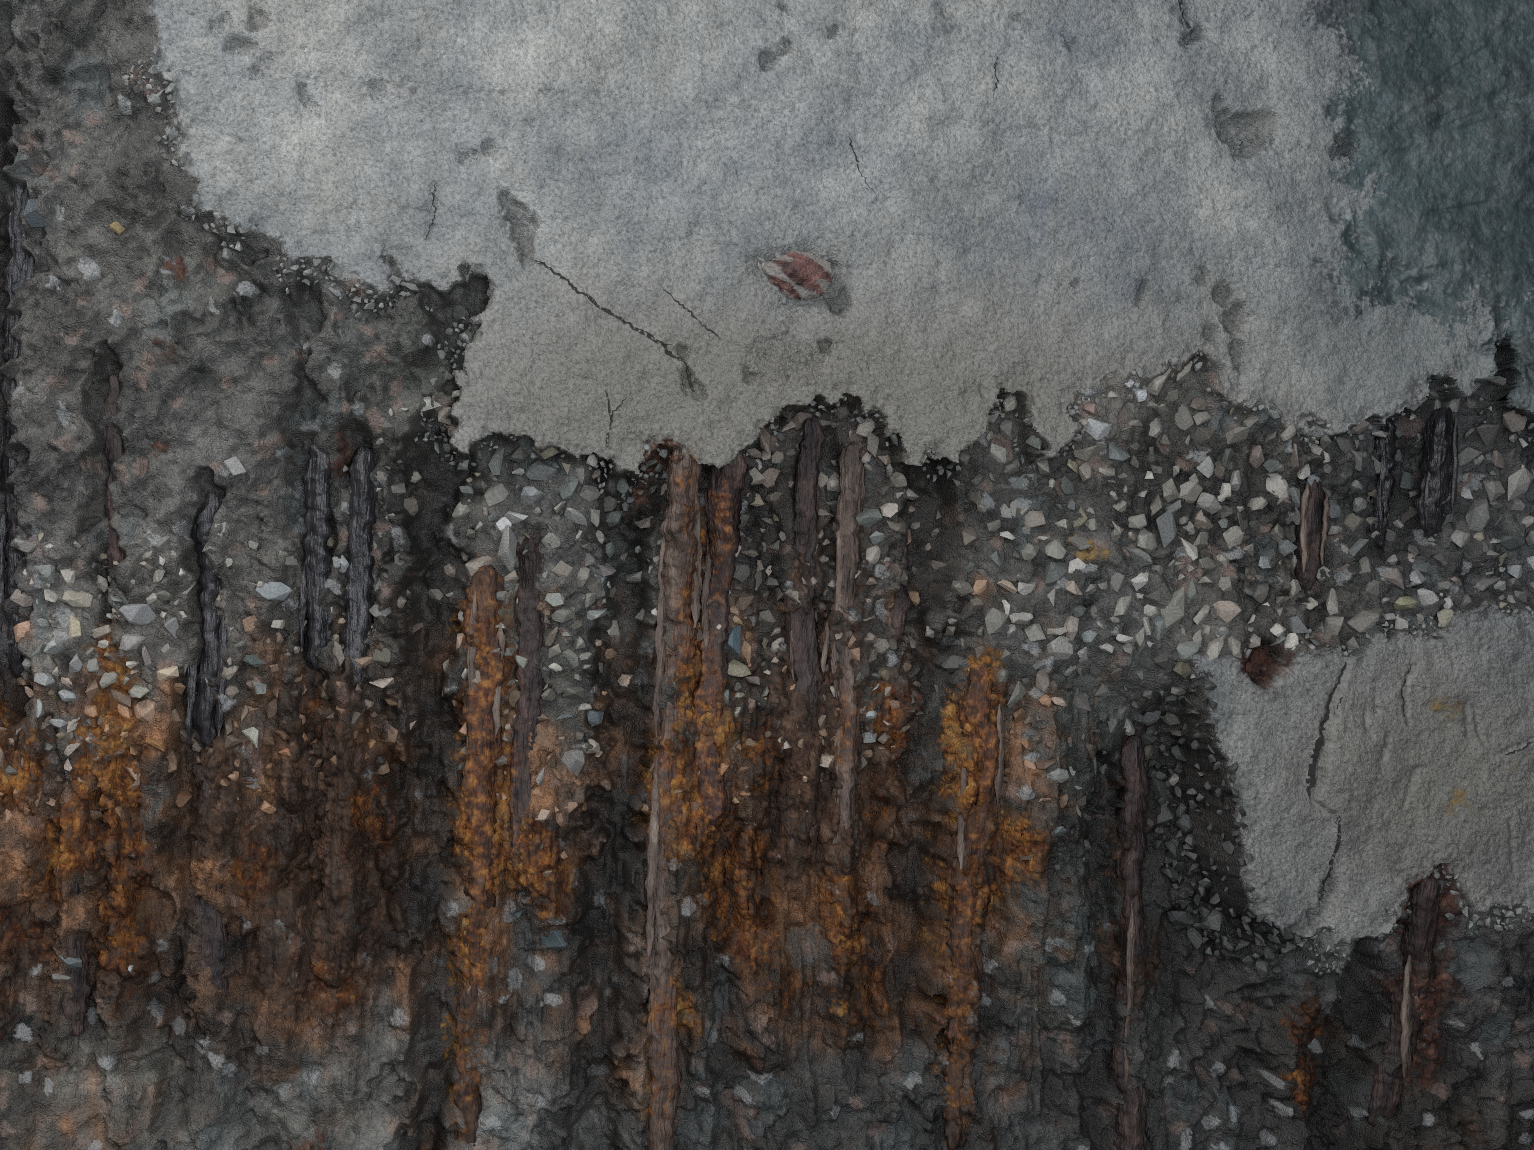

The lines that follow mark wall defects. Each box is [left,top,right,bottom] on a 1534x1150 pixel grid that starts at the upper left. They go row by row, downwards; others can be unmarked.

spalling [208,1,275,82]
hole [498,190,542,274]
corrosion [632,436,695,507]
spalling [1294,479,1330,591]
spalling [1368,418,1397,549]
spalling [1414,407,1459,538]
corrosion [0,611,164,1026]
corrosion [183,660,407,1037]
corrosion [418,574,585,1150]
corrosion [630,507,923,1045]
corrosion [918,647,1052,1119]
spalling [1367,876,1449,1126]